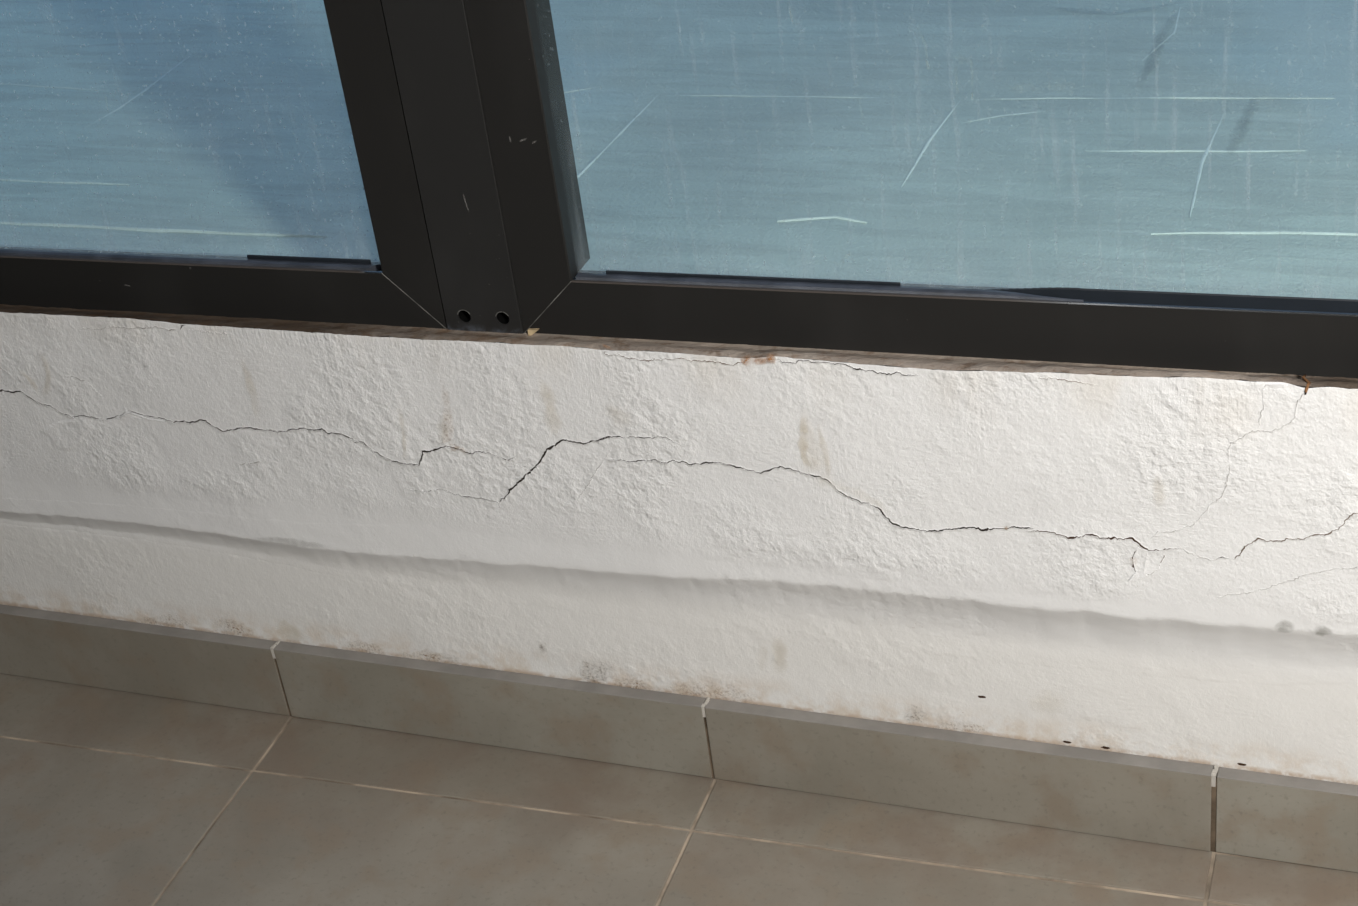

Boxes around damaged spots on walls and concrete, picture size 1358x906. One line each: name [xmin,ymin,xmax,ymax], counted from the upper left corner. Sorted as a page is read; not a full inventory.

crack [0,367,1358,600]